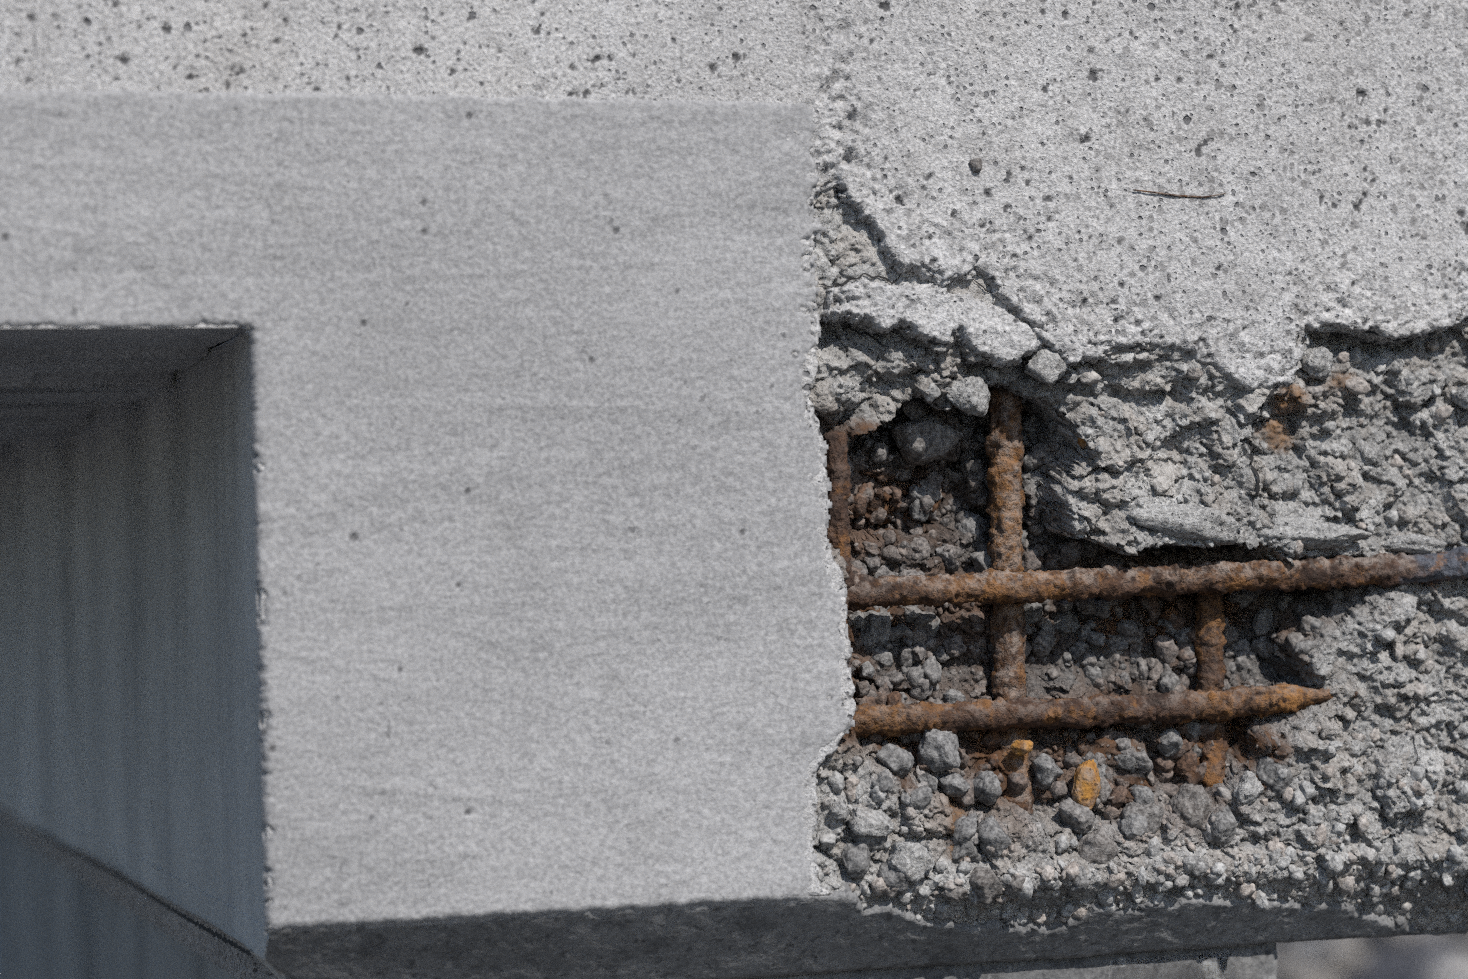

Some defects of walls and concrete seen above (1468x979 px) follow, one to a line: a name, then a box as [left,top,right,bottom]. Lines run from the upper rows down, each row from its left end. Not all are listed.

spalling [969,158,982,173]
spalling [807,180,1468,711]
corrosion [1266,385,1302,447]
corrosion [851,458,913,524]
corrosion [846,604,906,648]
corrosion [1081,598,1182,640]
corrosion [879,736,920,757]
corrosion [970,731,1016,790]
corrosion [1060,723,1138,761]
spalling [812,578,1468,932]
corrosion [1225,717,1291,789]